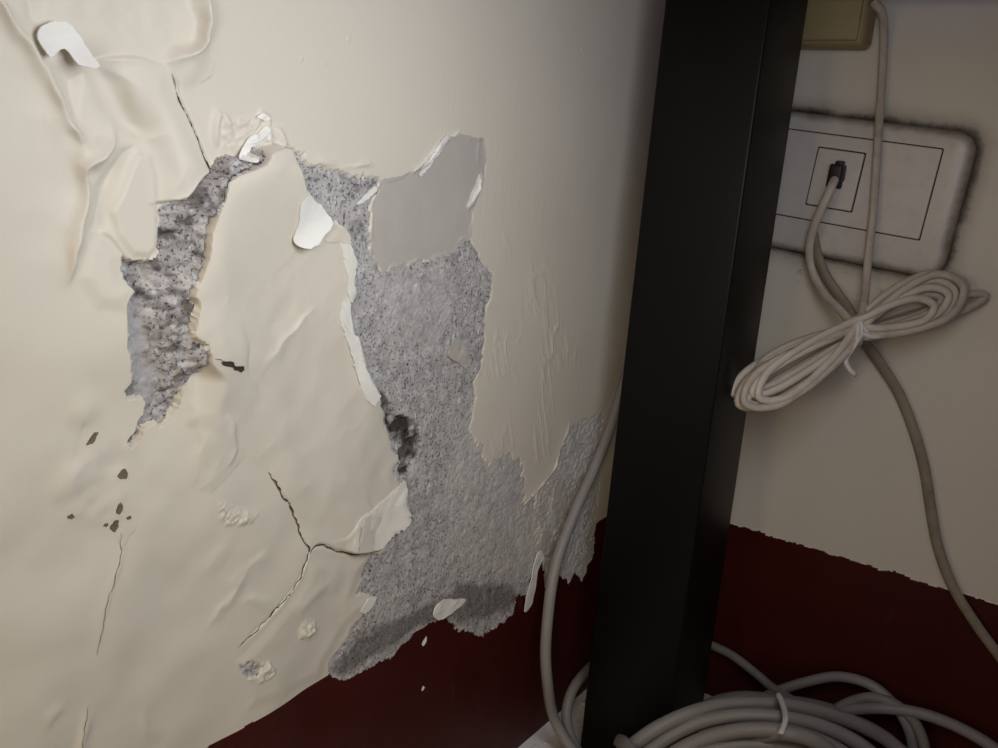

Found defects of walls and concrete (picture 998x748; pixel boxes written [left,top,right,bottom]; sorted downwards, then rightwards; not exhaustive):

flaking render [56,59,604,715]
crack [97,540,122,652]
crack [238,473,368,648]